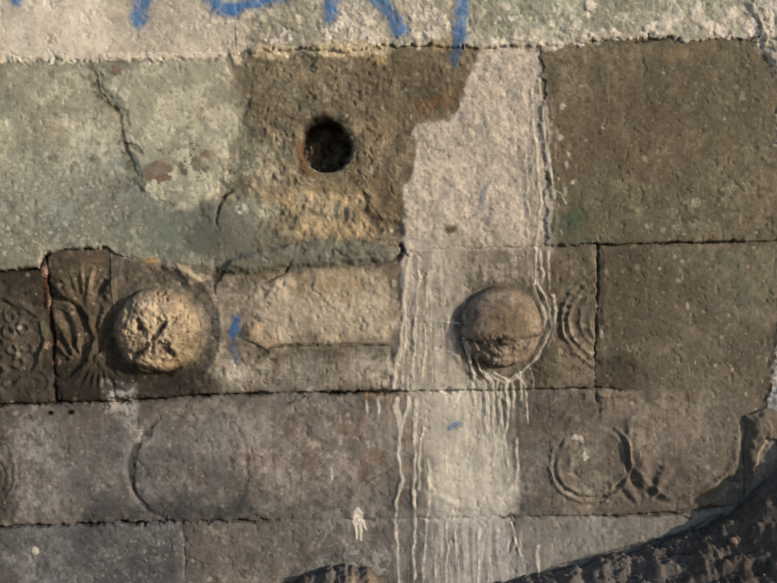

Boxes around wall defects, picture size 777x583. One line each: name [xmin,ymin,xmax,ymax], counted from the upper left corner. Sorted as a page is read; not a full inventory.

crack [91,64,118,111]
crack [122,130,143,189]
water stain [349,252,462,583]